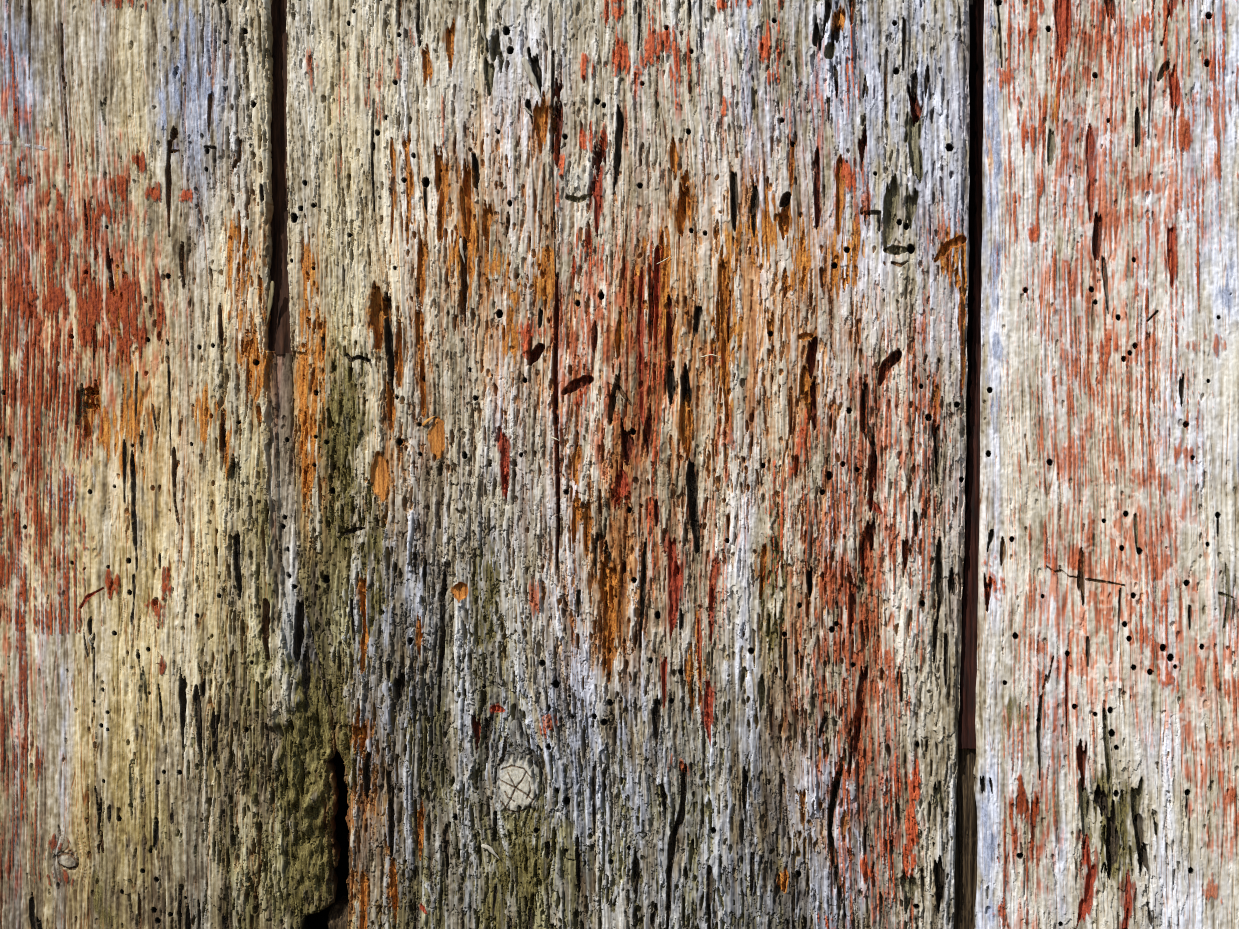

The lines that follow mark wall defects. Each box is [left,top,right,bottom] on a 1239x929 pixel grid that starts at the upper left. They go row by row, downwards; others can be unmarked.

hole [730,172,759,238]
spalling [777,101,795,240]
spalling [814,65,930,255]
peeling [0,50,192,929]
spalling [220,411,241,482]
spalling [233,534,242,600]
spalling [437,562,468,715]
spalling [498,428,510,501]
spalling [517,48,735,747]
peeling [755,291,966,929]
spalling [980,513,1158,929]
spalling [650,754,689,929]